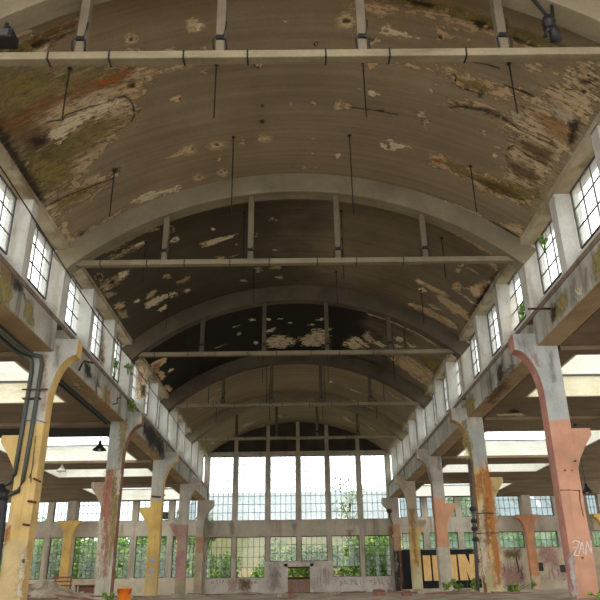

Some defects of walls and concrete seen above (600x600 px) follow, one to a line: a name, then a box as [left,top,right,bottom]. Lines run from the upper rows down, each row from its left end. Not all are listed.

damp [0,65,163,202]
damp [426,61,600,212]
peeling [45,164,182,243]
peeling [94,269,130,319]
peeling [134,274,191,312]
peeling [407,264,491,331]
peeling [266,318,332,349]
peeling [343,329,417,350]
damp [143,422,164,457]
corrosion [476,470,501,584]